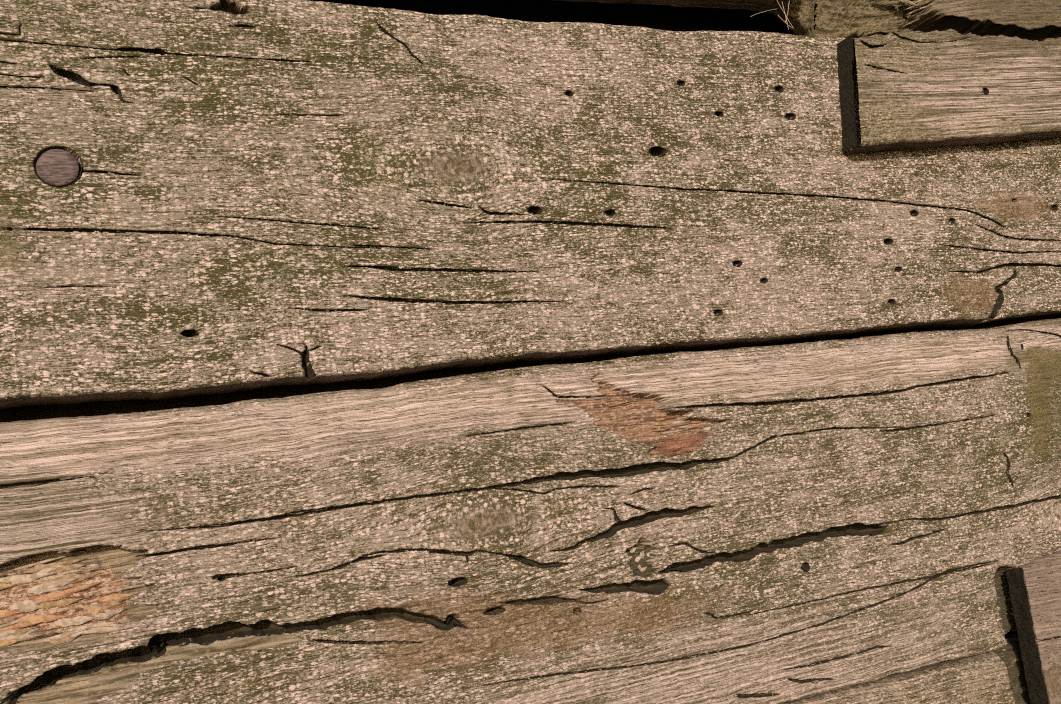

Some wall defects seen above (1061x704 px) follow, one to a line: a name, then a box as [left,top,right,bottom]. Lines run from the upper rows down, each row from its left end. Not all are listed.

crack [0,23,315,103]
crack [376,21,424,65]
crack [420,200,669,228]
crack [544,178,1061,409]
crack [277,344,321,379]
crack [468,384,604,436]
crack [140,415,993,578]
crack [887,452,1061,545]
crack [462,559,1003,689]
crack [737,645,891,698]